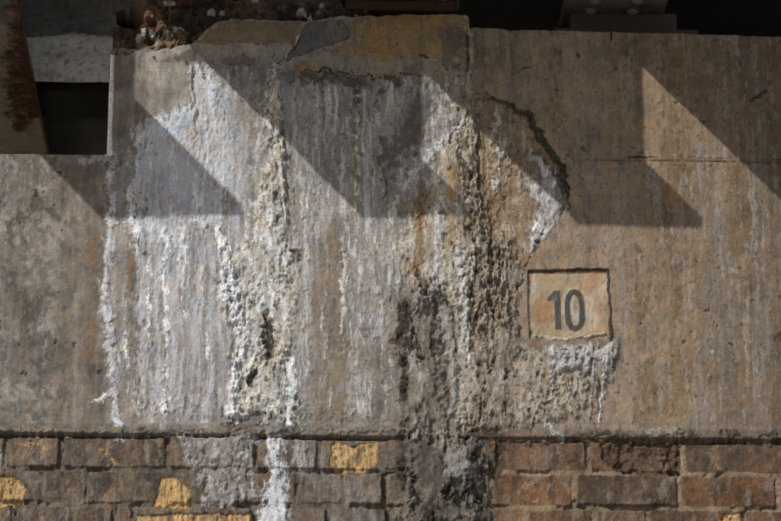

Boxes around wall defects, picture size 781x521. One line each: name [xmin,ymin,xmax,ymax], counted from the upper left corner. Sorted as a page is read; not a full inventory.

corrosion [0,0,40,131]
water stain [105,54,114,157]
peeling [280,19,350,62]
water stain [110,55,623,464]
spalling [475,97,571,300]